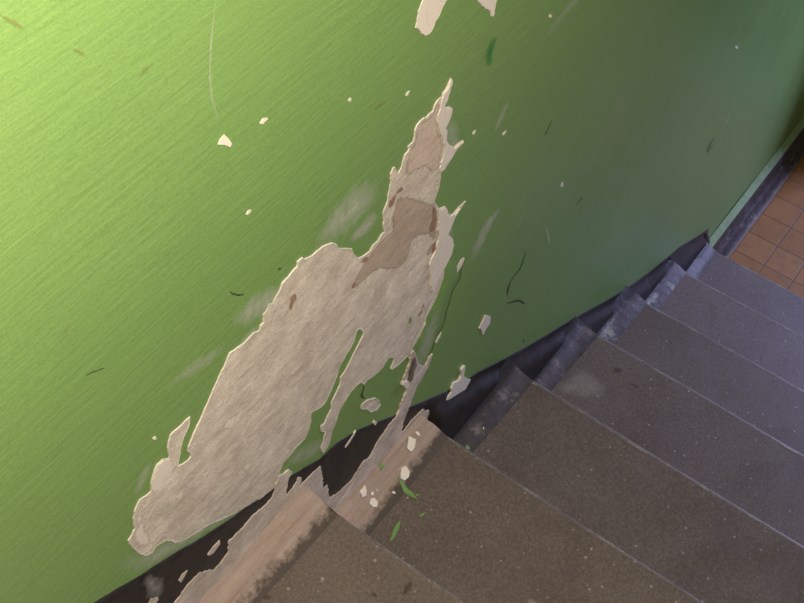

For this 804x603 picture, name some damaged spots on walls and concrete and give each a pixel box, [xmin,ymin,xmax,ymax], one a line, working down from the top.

peeling [415,0,447,36]
peeling [477,0,497,17]
spalling [127,78,466,603]
peeling [446,365,470,400]